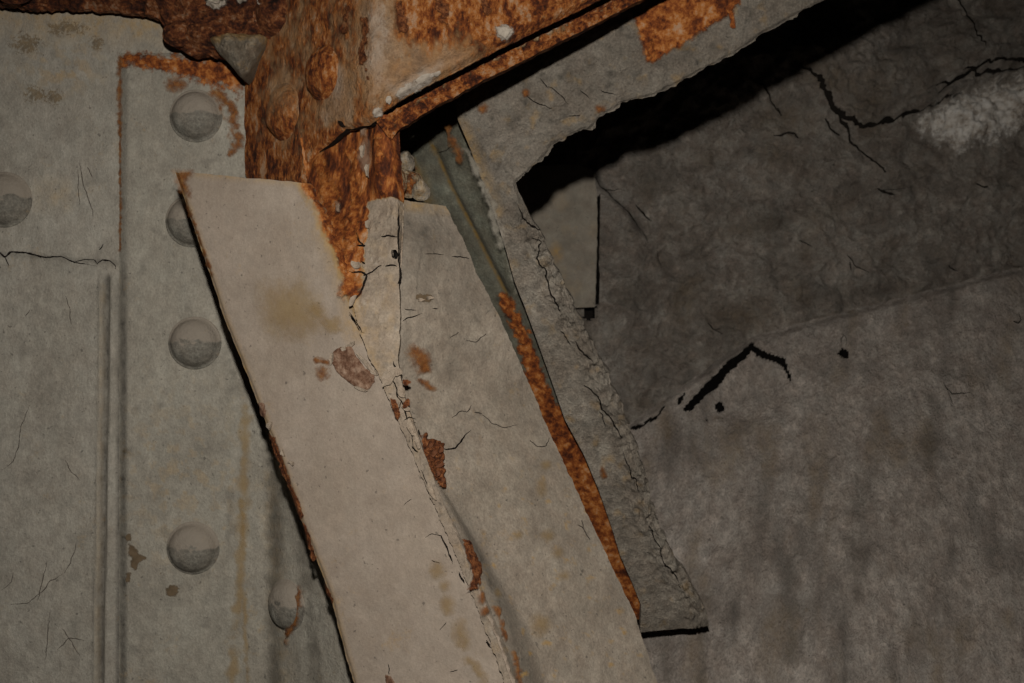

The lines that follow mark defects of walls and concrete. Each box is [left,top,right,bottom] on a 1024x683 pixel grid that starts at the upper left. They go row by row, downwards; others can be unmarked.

crack [0,245,116,269]
corrosion [117,51,243,250]
corrosion [311,148,362,298]
corrosion [341,5,369,80]
crack [347,204,437,332]
corrosion [634,0,741,62]
crack [800,0,1024,195]
corrosion [258,403,316,561]
spalling [329,341,379,392]
crack [382,361,549,505]
corrosion [499,292,640,619]
crack [518,205,791,491]